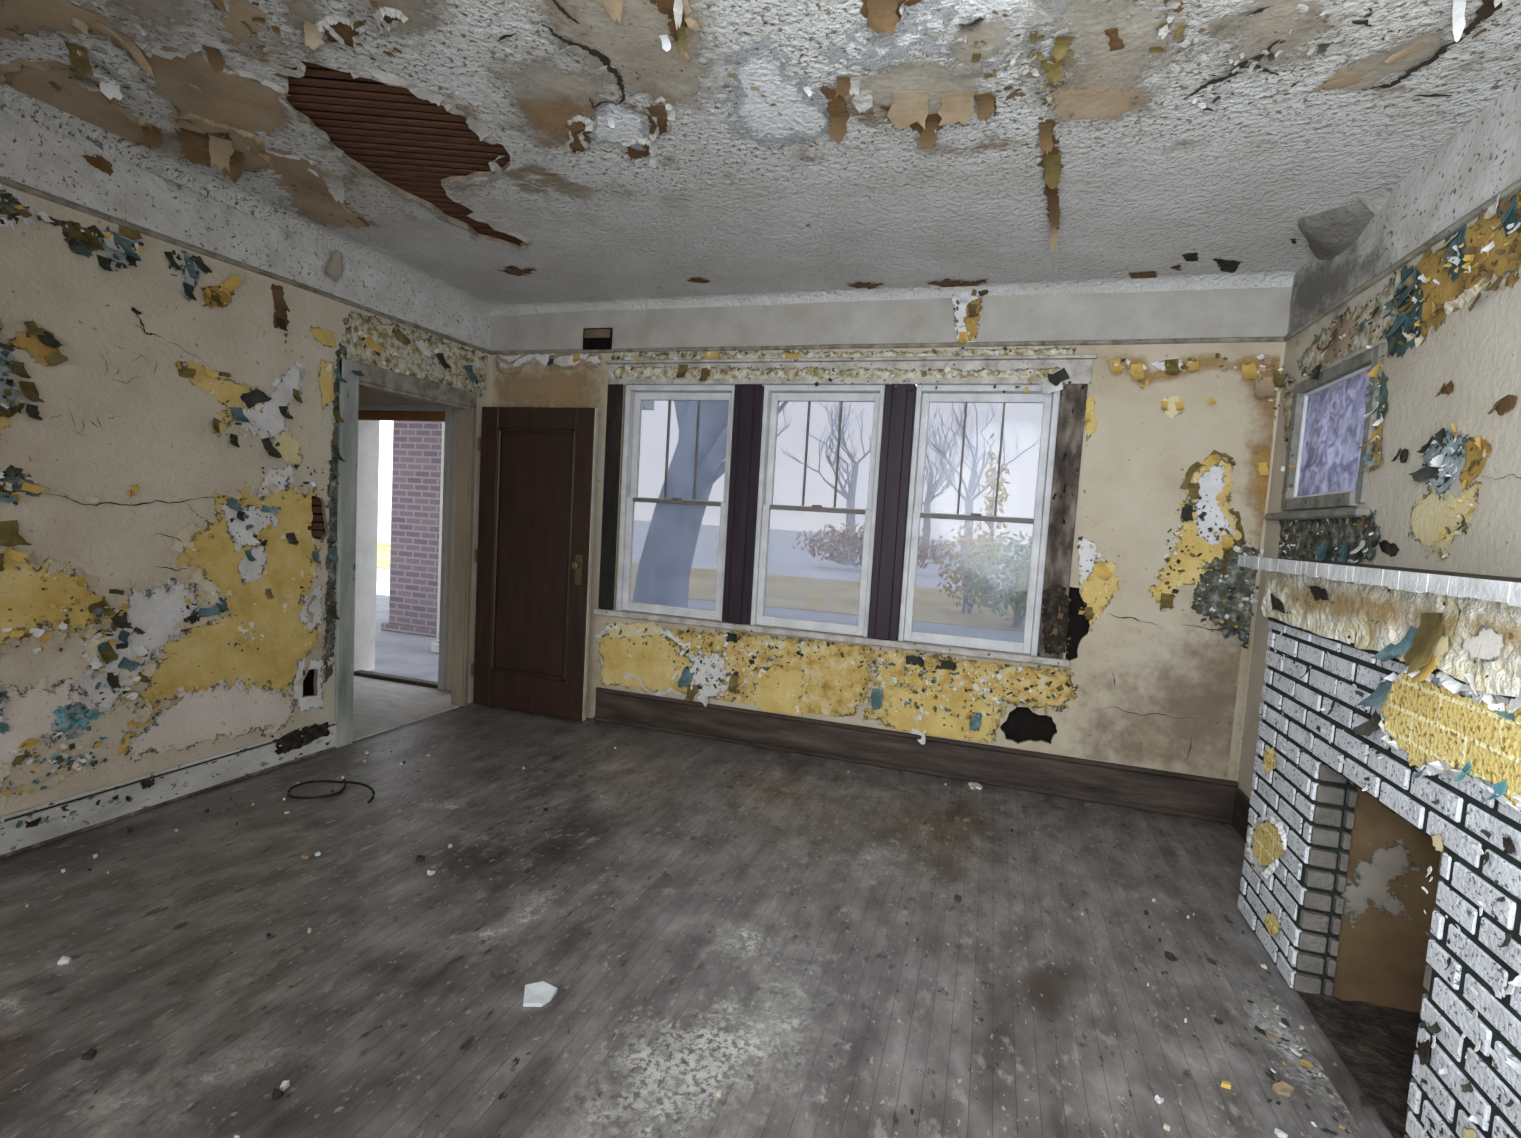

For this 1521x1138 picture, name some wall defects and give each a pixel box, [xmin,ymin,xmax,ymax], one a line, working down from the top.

crack [496,0,626,109]
peeling [0,0,524,246]
peeling [530,0,1082,253]
peeling [0,184,144,272]
peeling [164,249,242,309]
peeling [1109,186,1521,816]
peeling [0,278,1120,836]
peeling [1247,815,1287,879]
peeling [1263,913,1281,936]
peeling [1470,829,1516,916]